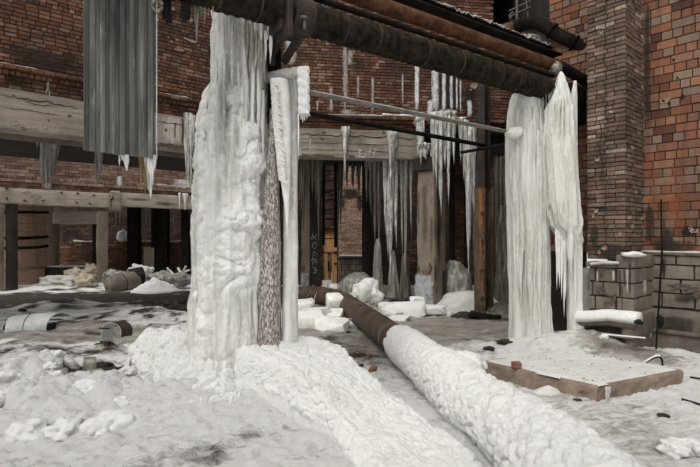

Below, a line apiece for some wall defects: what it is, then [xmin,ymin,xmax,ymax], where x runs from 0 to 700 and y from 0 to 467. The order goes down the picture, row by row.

crack [0,94,79,116]